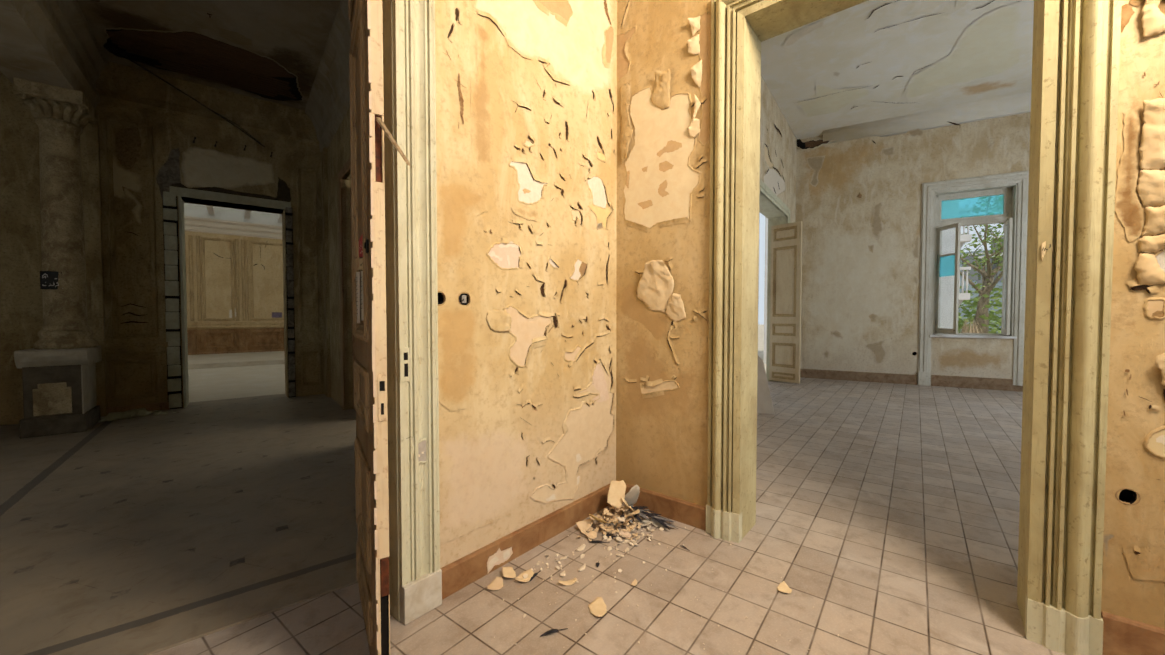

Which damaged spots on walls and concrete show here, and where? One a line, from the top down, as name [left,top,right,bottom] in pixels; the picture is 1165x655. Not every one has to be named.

crack [865,0,994,32]
peeling [472,0,711,232]
peeling [112,124,291,226]
peeling [486,237,524,270]
peeling [548,254,590,285]
crack [444,8,709,488]
peeling [619,260,686,341]
peeling [1127,279,1160,294]
peeling [502,304,554,368]
peeling [1155,353,1165,386]
peeling [530,360,616,505]
peeling [1142,425,1165,459]